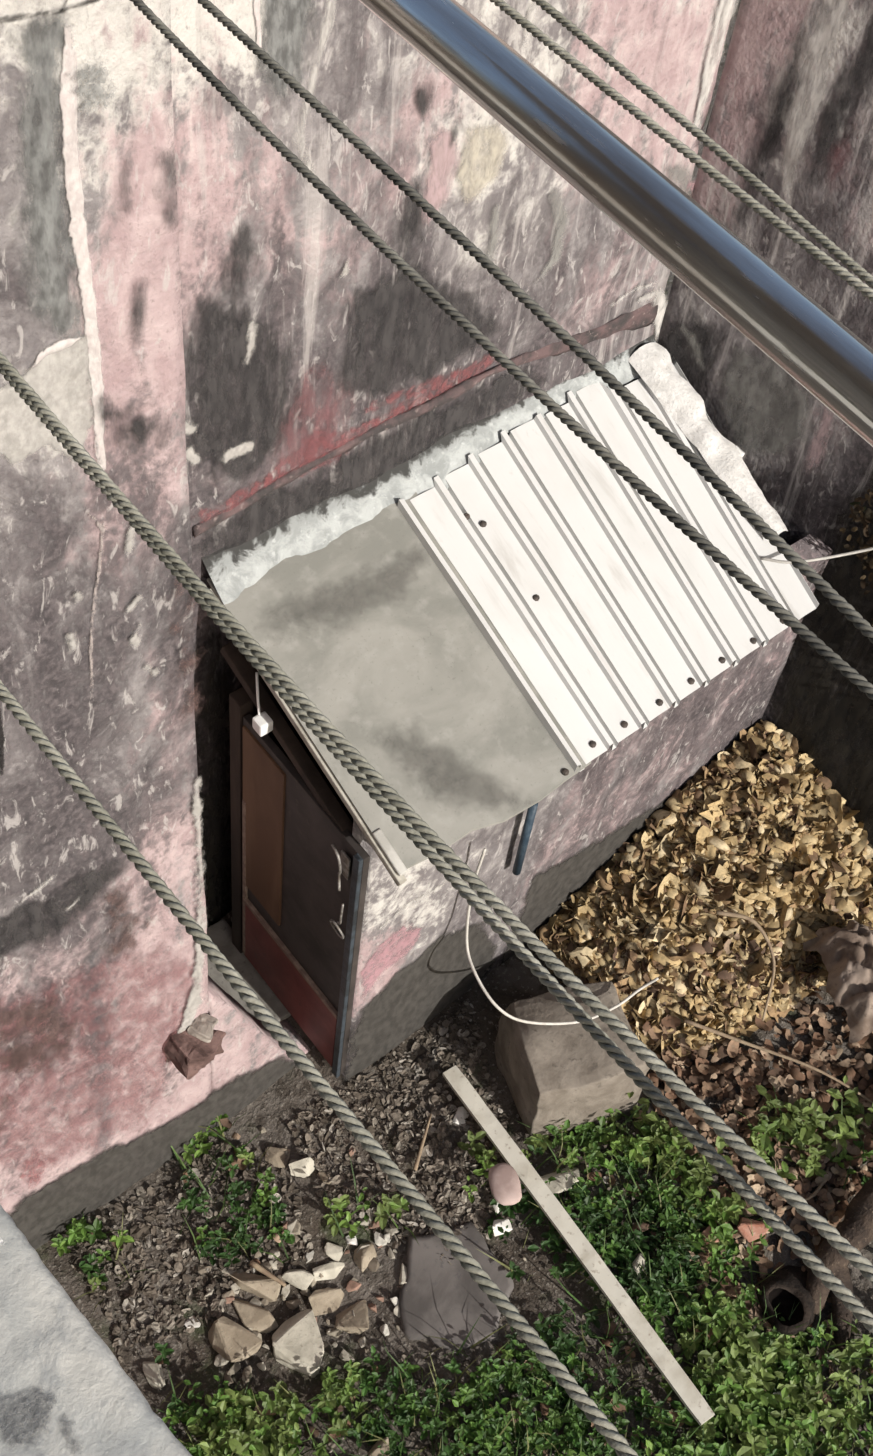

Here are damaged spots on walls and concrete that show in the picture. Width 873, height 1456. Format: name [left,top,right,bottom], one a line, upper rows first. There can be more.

crack [0,0,99,23]
leakage [737,0,873,223]
leakage [188,227,291,479]